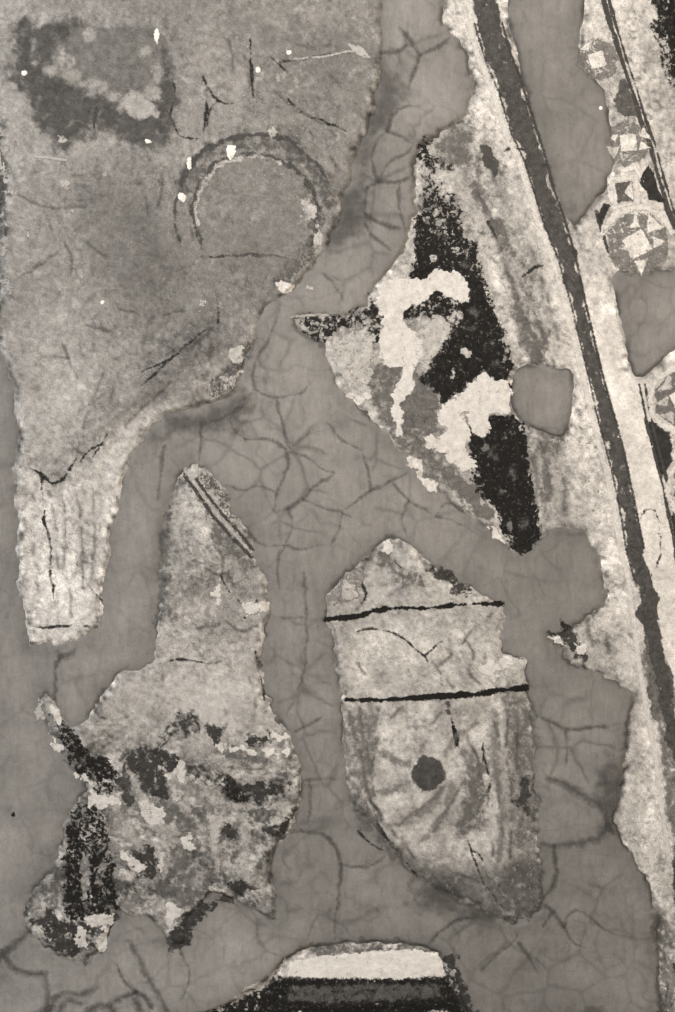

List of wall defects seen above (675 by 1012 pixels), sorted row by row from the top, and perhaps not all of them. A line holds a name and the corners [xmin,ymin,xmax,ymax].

crack [249,39,351,98]
crack [167,76,226,140]
spalling [507,0,615,226]
crack [145,307,220,383]
spalling [611,269,675,377]
spalling [510,364,574,437]
crack [20,434,107,597]
crack [39,622,90,630]
crack [357,627,437,662]
peeling [125,747,204,830]
peeling [203,770,285,810]
peeling [29,885,91,958]